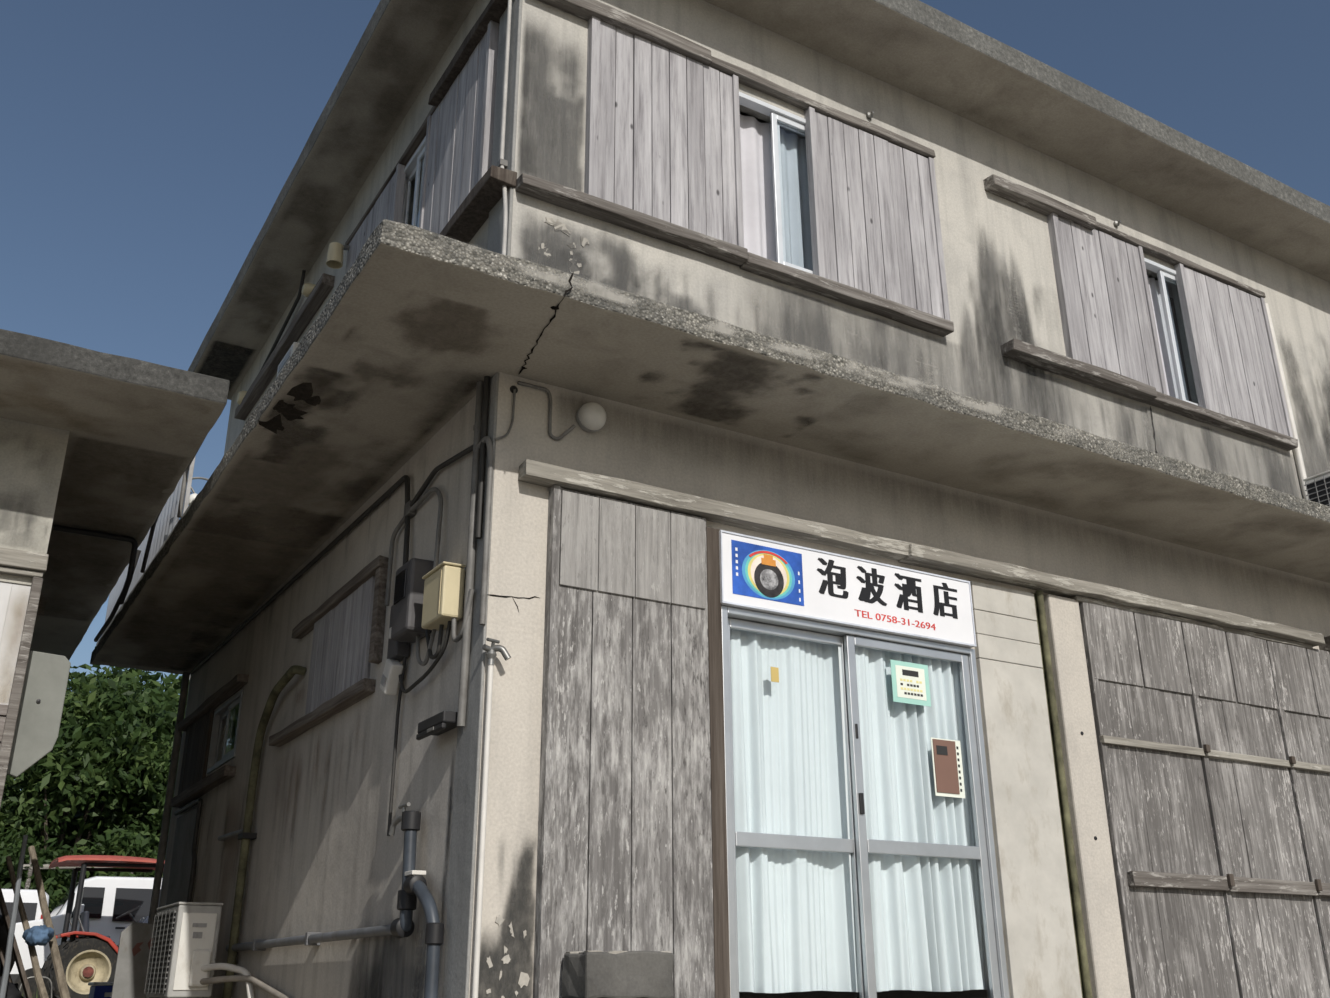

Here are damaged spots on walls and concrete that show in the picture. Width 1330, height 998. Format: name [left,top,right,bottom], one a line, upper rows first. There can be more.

damp [524,225,639,292]
peeling [539,217,626,303]
crack [519,272,574,374]
damp [684,343,765,421]
damp [783,292,834,354]
damp [856,318,942,381]
damp [971,247,1058,419]
damp [1202,427,1221,473]
damp [1261,437,1330,496]
peeling [486,915,530,998]